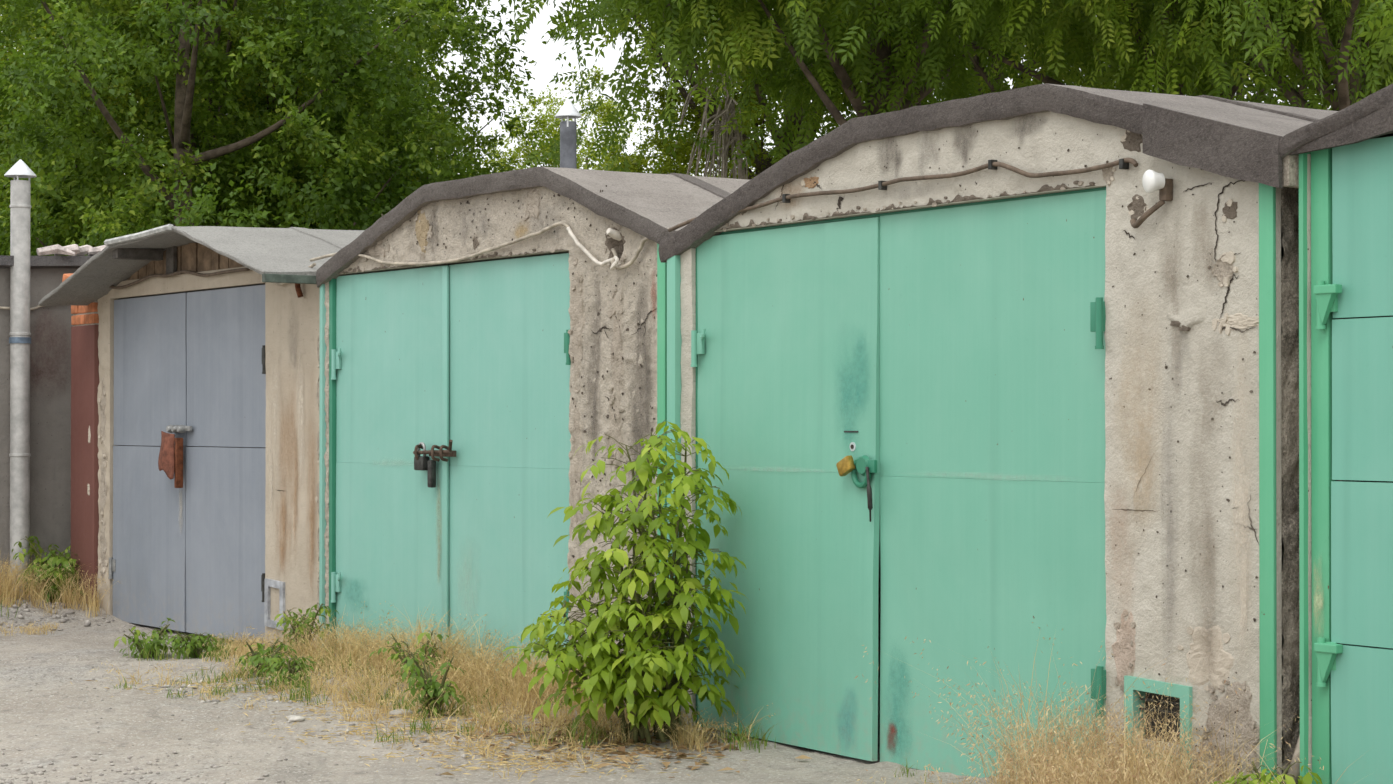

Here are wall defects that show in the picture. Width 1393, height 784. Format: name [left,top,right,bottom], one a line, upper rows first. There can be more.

spalling [1120,129,1143,152]
spalling [715,167,1117,232]
spalling [1127,194,1149,220]
spalling [338,206,434,274]
spalling [604,223,626,267]
crack [1185,180,1252,333]